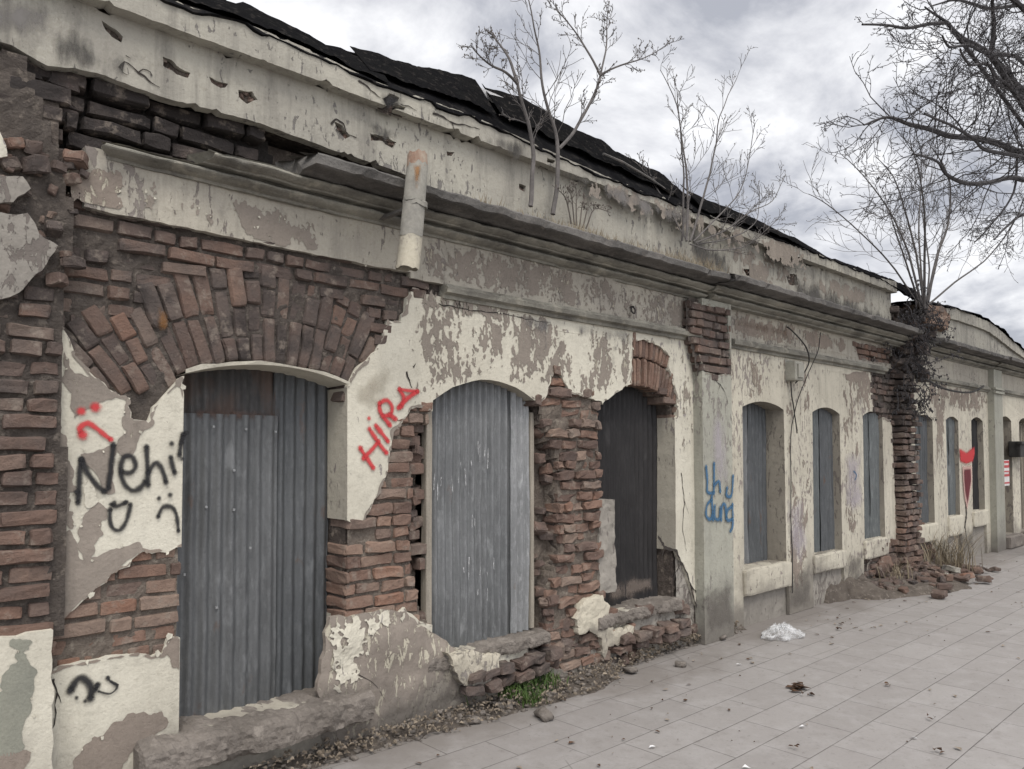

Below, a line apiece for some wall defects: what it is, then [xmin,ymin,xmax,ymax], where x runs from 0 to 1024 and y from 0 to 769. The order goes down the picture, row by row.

peeling [589,182,806,285]
flaking render [0,48,698,769]
crack [658,473,697,610]
flaking render [425,246,987,589]